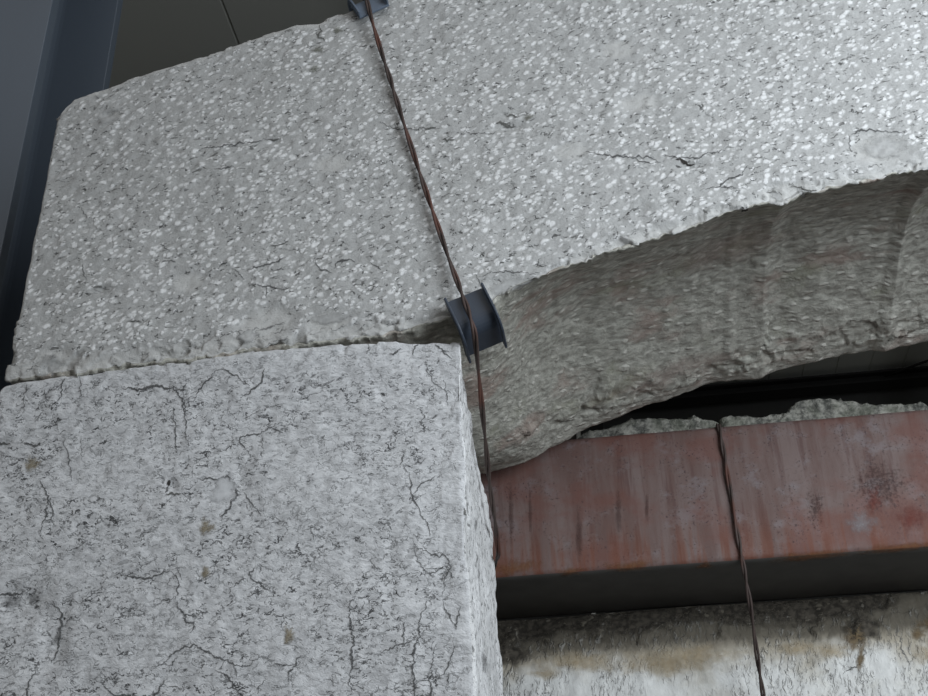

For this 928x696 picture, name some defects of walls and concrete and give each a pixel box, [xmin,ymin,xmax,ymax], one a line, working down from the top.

crack [22,379,82,410]
crack [122,368,265,453]
crack [239,422,283,458]
crack [366,344,452,404]
crack [40,479,54,532]
crack [199,475,261,521]
crack [381,449,460,696]
crack [97,566,301,696]
crack [348,598,360,695]
damp [497,593,897,669]